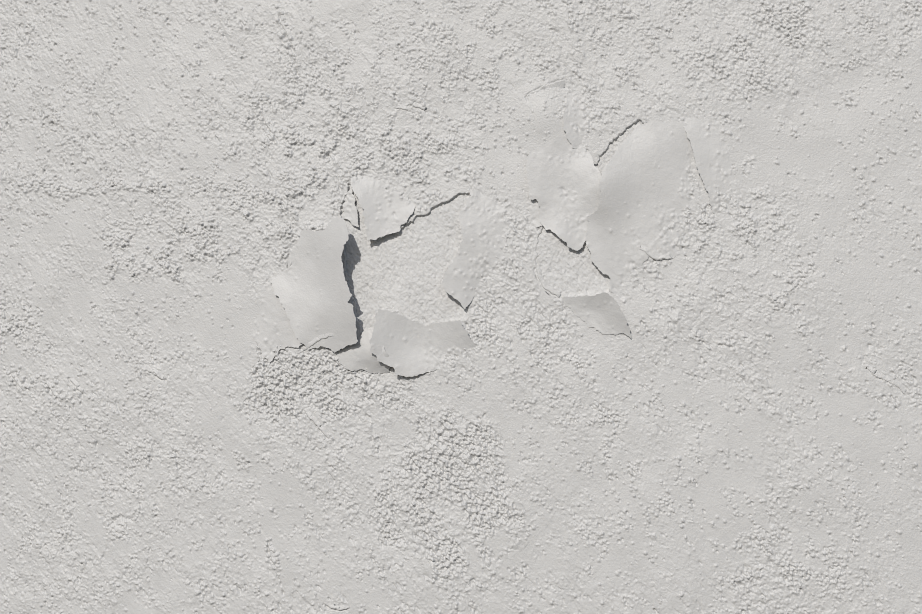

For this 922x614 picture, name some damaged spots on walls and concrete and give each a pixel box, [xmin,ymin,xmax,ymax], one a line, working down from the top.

peeling [252,175,518,377]
peeling [526,94,738,339]